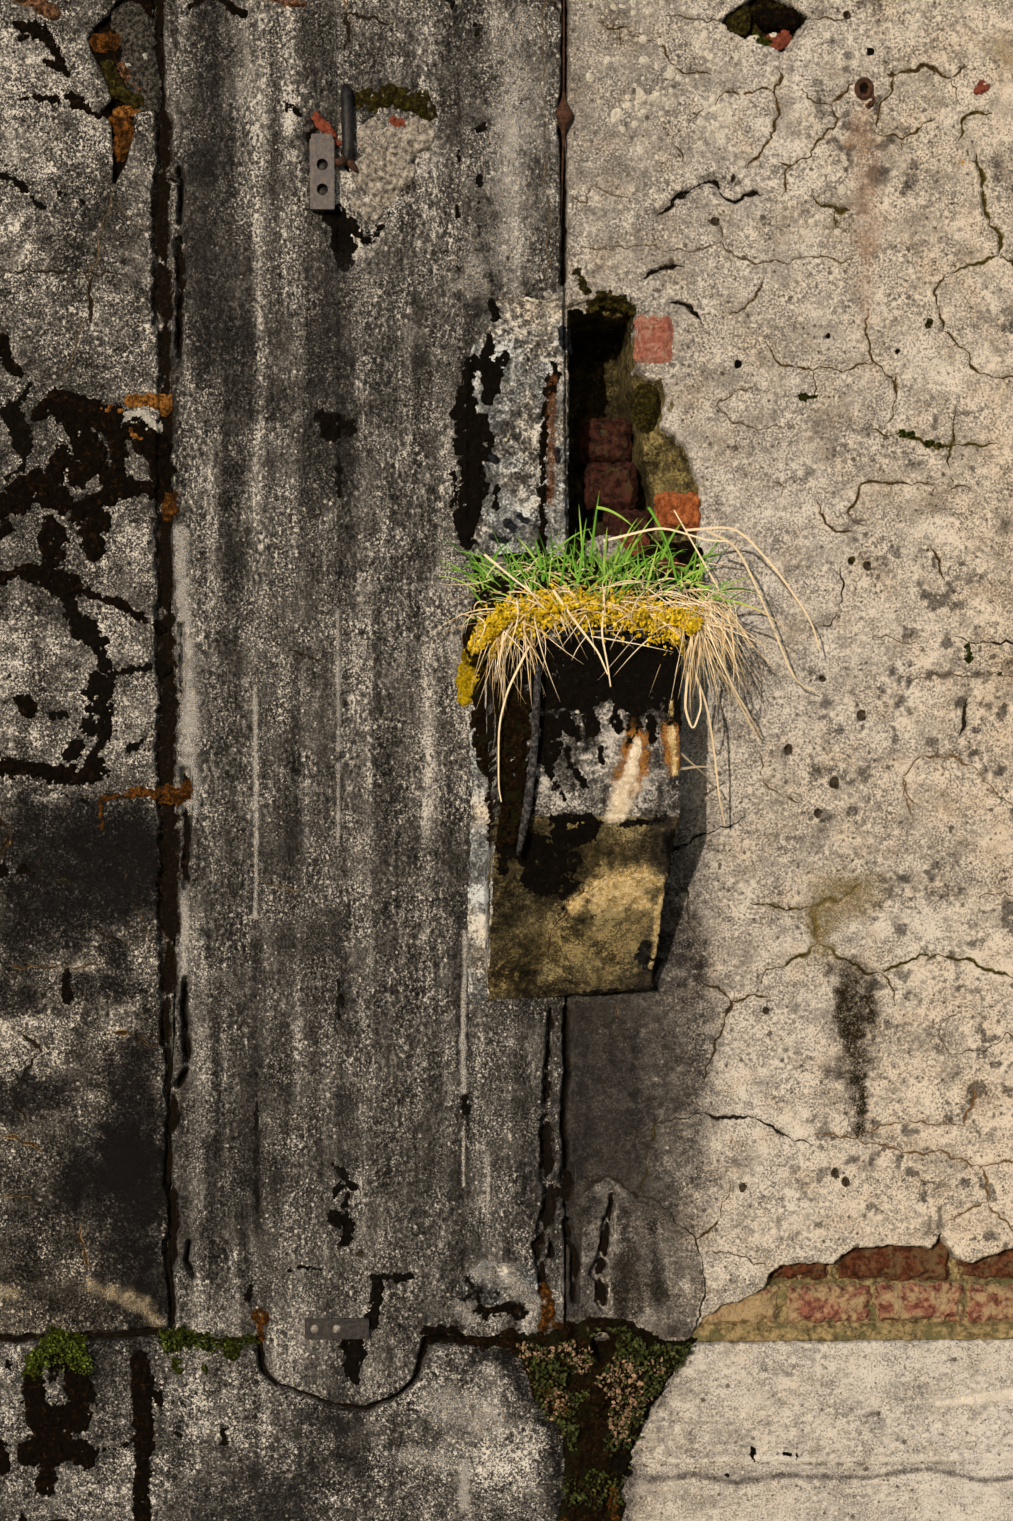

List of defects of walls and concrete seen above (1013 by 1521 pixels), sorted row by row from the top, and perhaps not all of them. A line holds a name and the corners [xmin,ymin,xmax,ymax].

spalling [723,0,811,53]
crack [540,0,1013,379]
spalling [465,291,587,557]
crack [717,308,993,533]
crack [823,571,845,627]
crack [926,546,945,581]
corrosion [98,780,194,830]
crack [876,635,1013,819]
crack [530,751,1013,1335]
damp [808,876,876,1139]
crack [259,1335,467,1412]